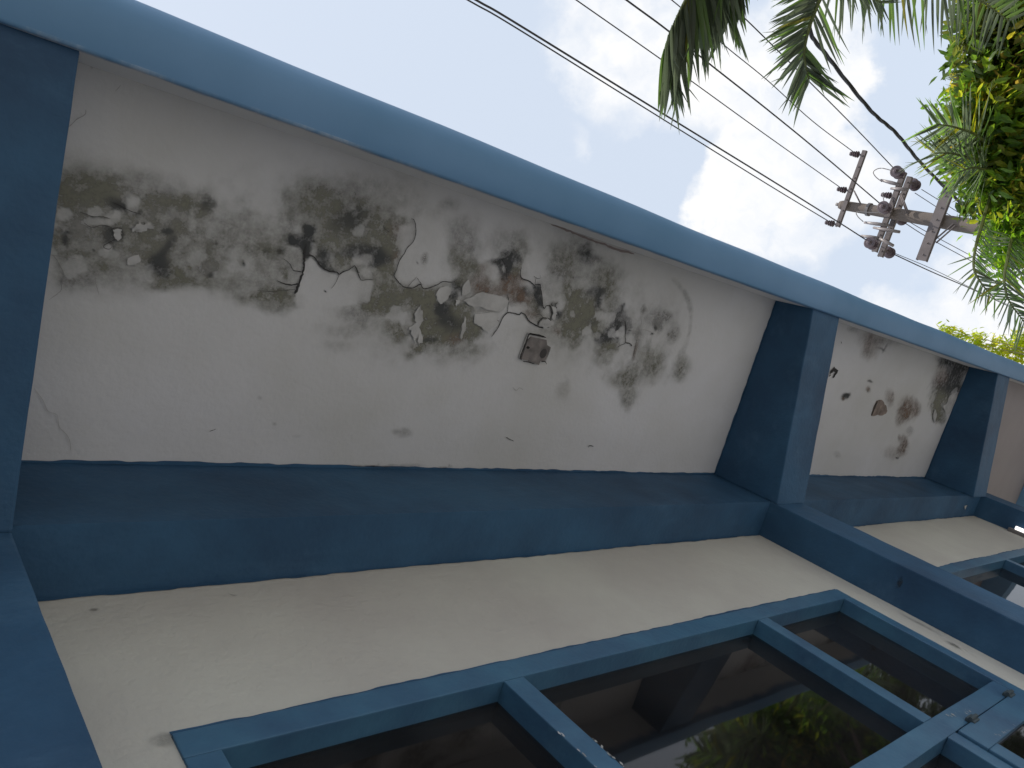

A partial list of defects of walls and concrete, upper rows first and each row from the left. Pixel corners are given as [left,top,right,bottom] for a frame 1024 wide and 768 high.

flaking render [113,220,155,241]
leakage [53,170,225,289]
crack [258,219,456,294]
flaking render [408,305,423,344]
leakage [240,183,678,357]
flaking render [435,280,509,339]
crack [492,259,558,336]
crack [551,224,634,254]
leakage [931,359,970,422]